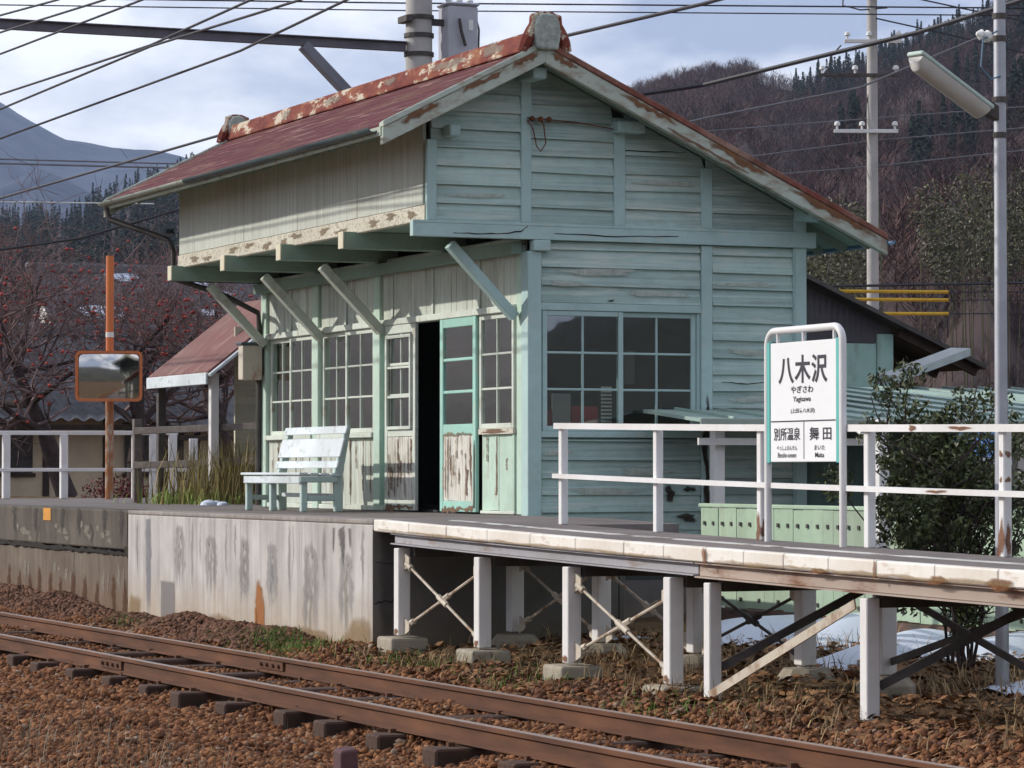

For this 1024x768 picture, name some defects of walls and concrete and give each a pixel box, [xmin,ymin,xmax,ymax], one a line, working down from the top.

rust [464,71,501,91]
rust [403,103,437,123]
rust [624,95,764,174]
peeling [230,233,302,254]
peeling [369,211,417,228]
crack [453,225,528,235]
crack [555,231,679,239]
peeling [388,438,412,497]
peeling [442,437,471,498]
water stain [333,528,350,557]
water stain [146,519,174,616]
rust [254,583,264,625]